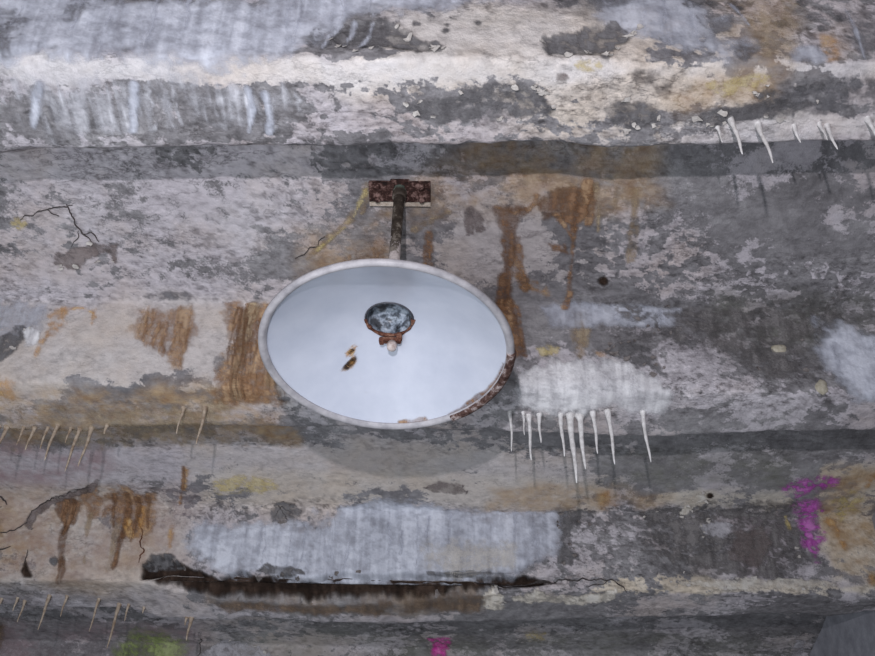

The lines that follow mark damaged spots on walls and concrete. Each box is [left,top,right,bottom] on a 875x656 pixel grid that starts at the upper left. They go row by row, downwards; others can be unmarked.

water stain [0,0,462,73]
peeling [320,17,452,52]
peeling [539,21,645,59]
crack [20,204,99,245]
peeling [54,241,118,270]
rust [496,179,600,357]
rust [136,309,194,368]
rust [214,302,282,405]
water stain [517,290,875,415]
rust [55,486,155,579]
water stain [186,500,561,585]
spalling [142,553,617,616]